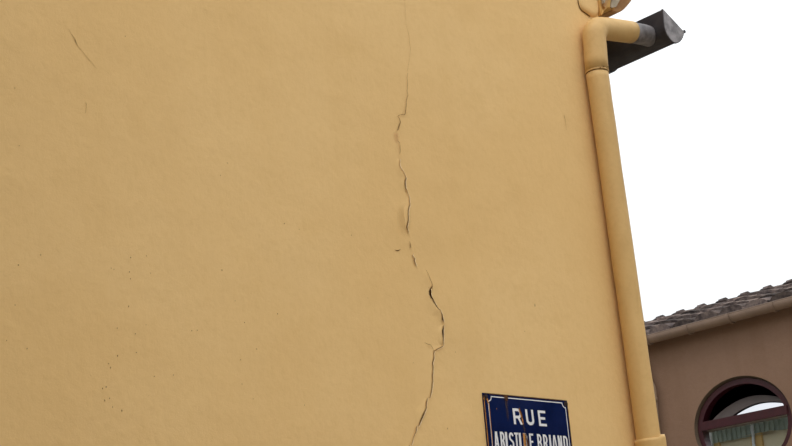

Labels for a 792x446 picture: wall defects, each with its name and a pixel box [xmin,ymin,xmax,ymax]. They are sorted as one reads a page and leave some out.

crack [394,14,445,446]